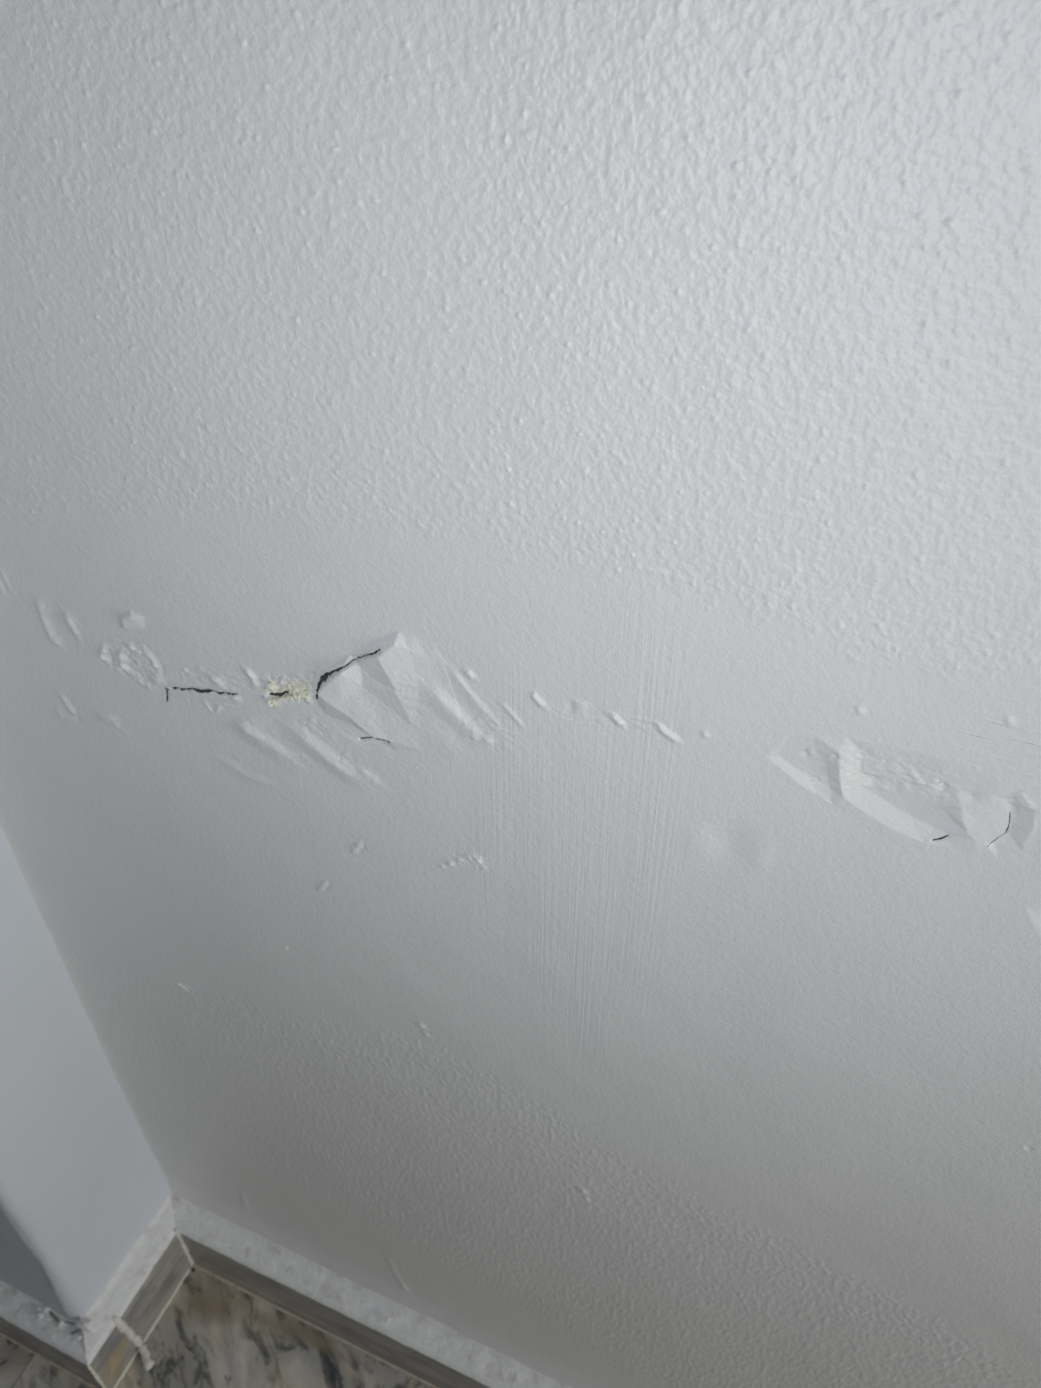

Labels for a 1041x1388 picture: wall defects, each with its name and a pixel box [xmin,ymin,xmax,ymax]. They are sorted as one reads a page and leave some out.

crack [165,649,380,702]
peeling [91,624,529,771]
flaking render [745,731,1041,864]